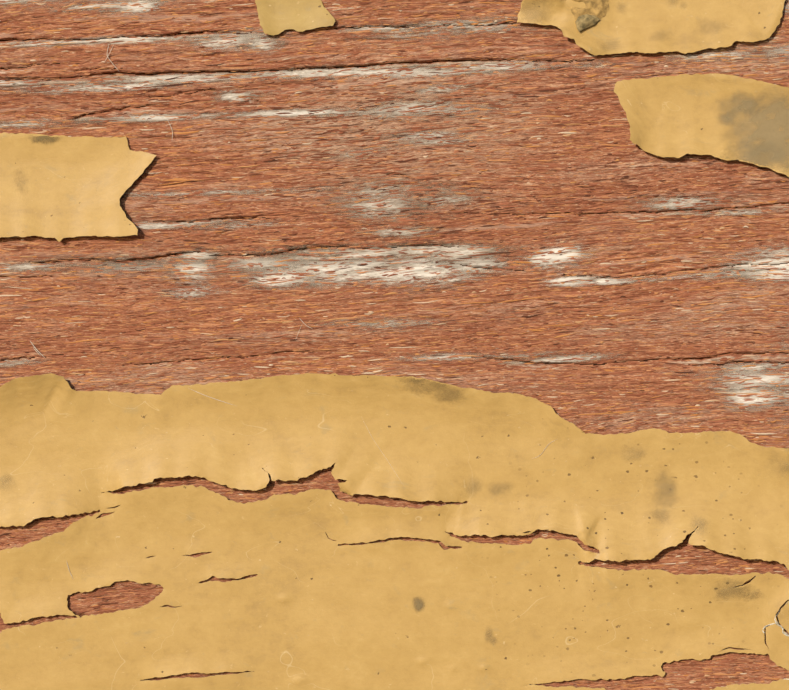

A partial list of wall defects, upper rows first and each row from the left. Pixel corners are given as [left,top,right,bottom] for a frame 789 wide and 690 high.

peeling [255,0,335,35]
peeling [517,0,785,55]
peeling [614,73,789,177]
peeling [0,132,156,242]
peeling [0,373,789,690]
crack [325,526,789,587]
crack [140,671,251,681]
crack [530,600,789,690]